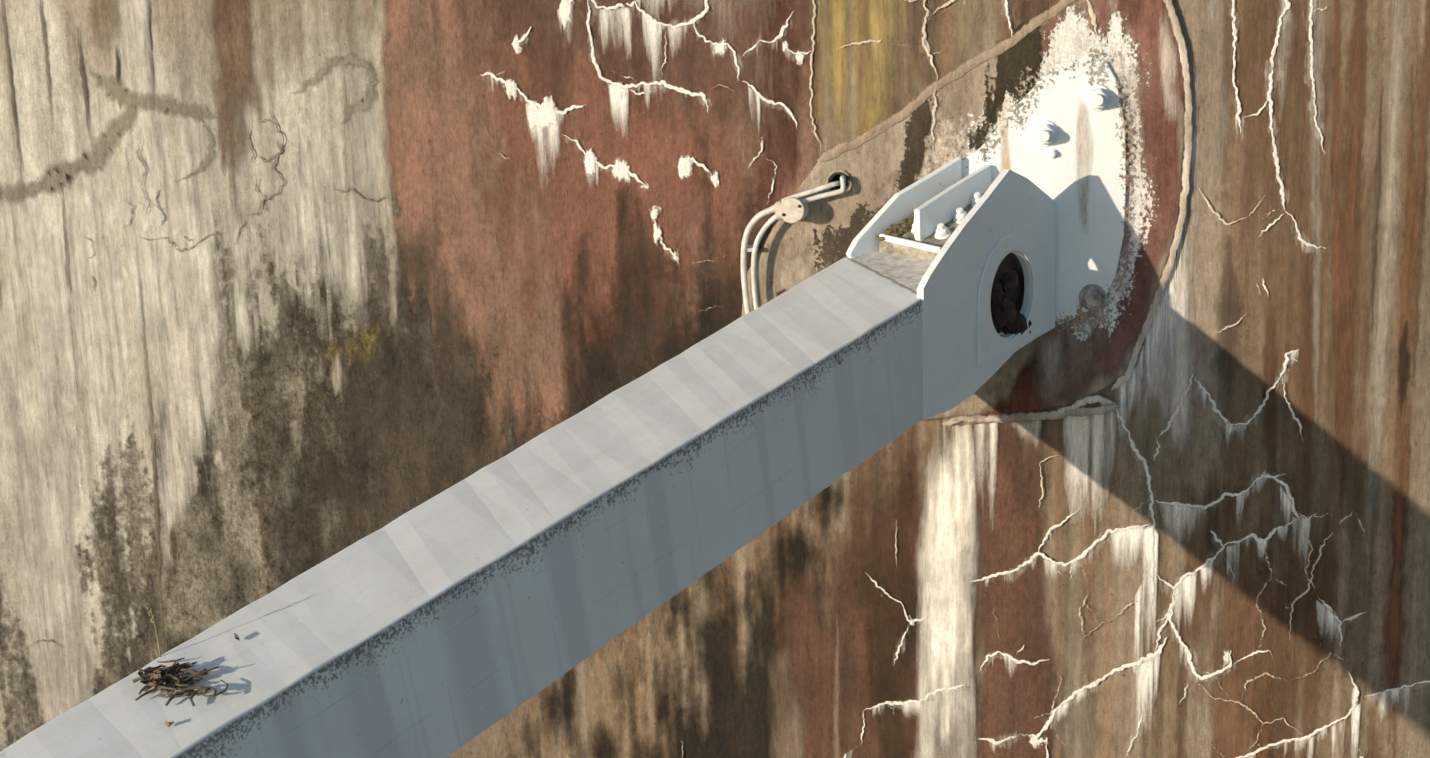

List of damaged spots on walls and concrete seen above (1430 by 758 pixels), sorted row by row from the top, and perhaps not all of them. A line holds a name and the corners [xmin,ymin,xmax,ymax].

damp [0,0,540,748]
crack [332,187,387,202]
corrosion [383,0,818,458]
damp [563,195,752,419]
crack [481,0,881,263]
corrosion [970,0,1185,758]
crack [1198,0,1327,249]
damp [861,422,997,758]
crack [844,349,1430,758]